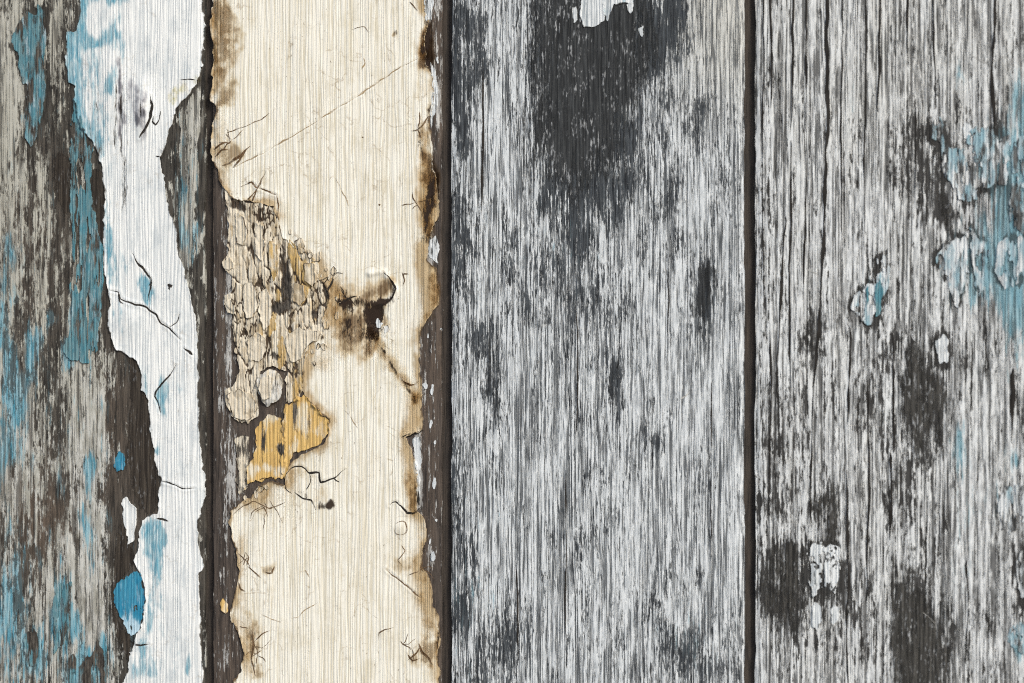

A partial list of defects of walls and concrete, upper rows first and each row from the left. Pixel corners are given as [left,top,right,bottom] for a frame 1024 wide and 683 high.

peeling [11,4,46,147]
crack [110,254,192,413]
peeling [53,0,442,683]
crack [214,59,412,216]
crack [319,272,356,304]
damp [337,280,397,373]
crack [380,273,407,305]
peeling [517,0,677,210]
peeling [851,255,890,325]
peeling [932,117,1024,308]
crack [237,466,342,528]
peeling [761,482,841,638]